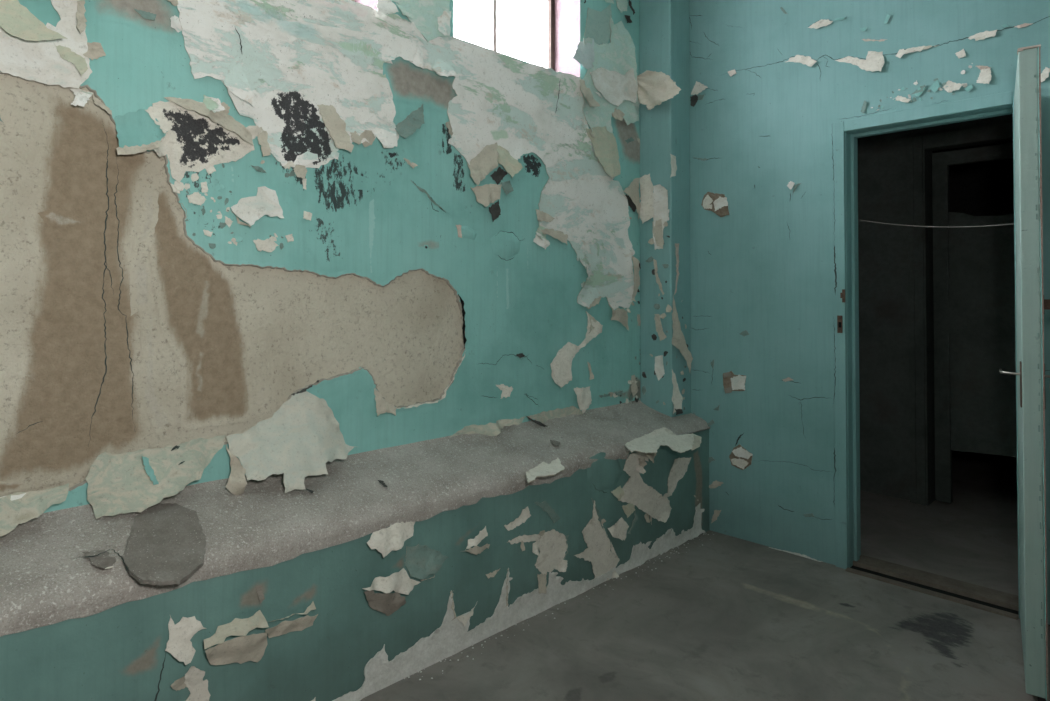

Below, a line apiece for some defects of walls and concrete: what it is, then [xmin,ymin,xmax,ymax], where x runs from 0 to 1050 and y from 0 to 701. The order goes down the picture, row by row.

crack [689,15,1050,104]
peeling [843,49,992,119]
leakage [263,57,467,274]
flaking render [701,192,729,217]
crack [88,121,134,445]
leakage [0,84,256,495]
peeling [0,0,708,537]
flaking render [723,371,746,394]
peeling [362,518,490,616]
peeling [504,427,702,594]
flaking render [729,433,753,470]
leakage [738,580,986,701]